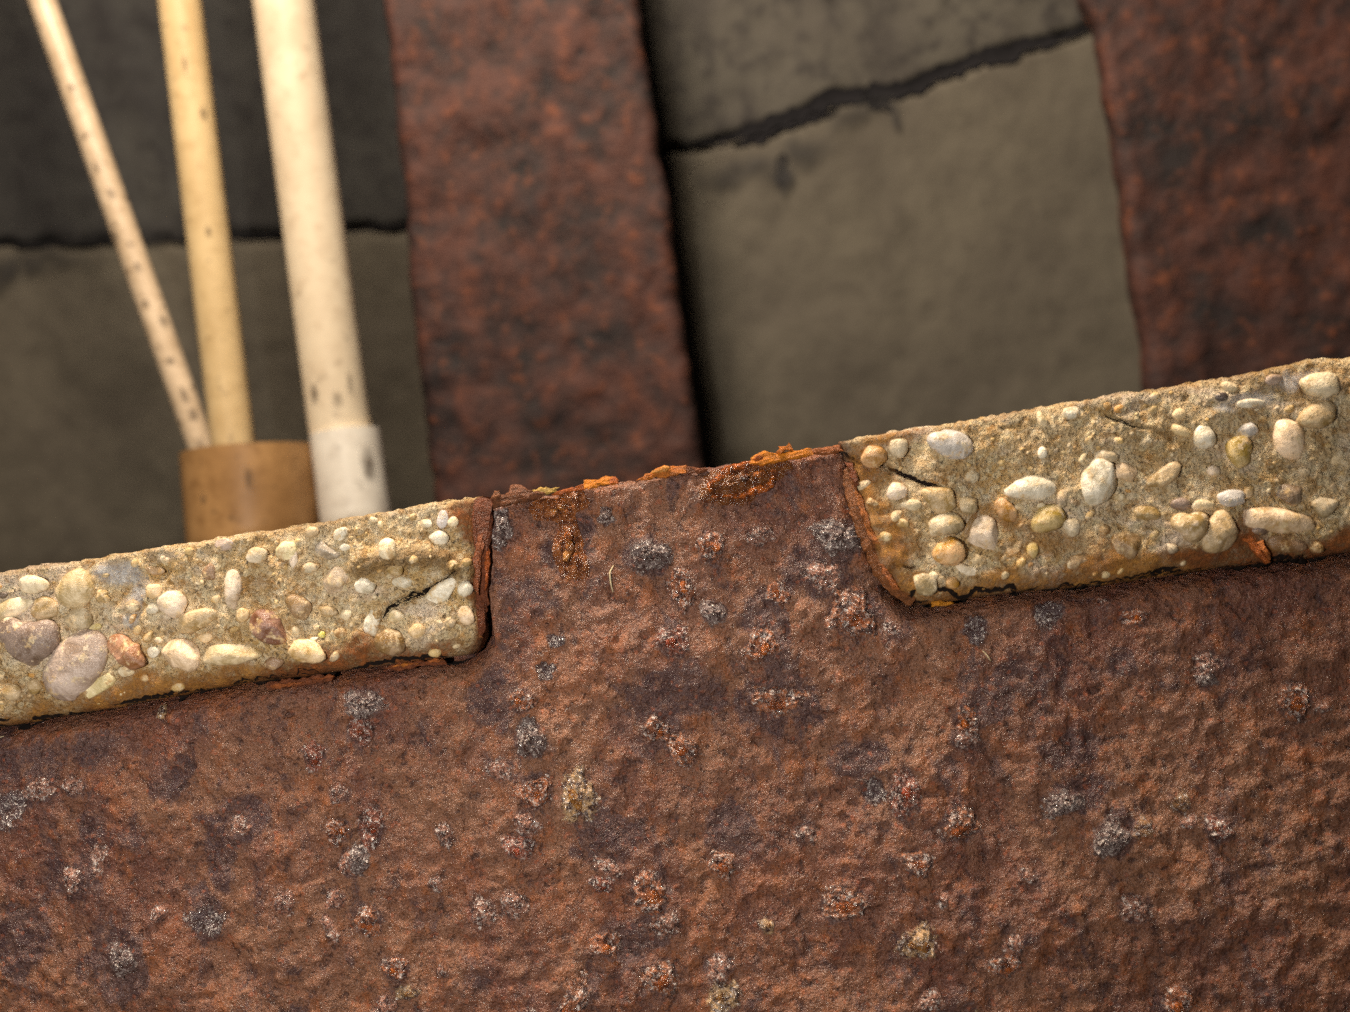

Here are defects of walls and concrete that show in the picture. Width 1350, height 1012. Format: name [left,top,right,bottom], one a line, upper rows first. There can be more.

crack [683,24,1090,185]
rust [699,461,794,506]
rust [766,431,1350,646]
rust [628,531,728,658]
rust [71,633,450,719]
rust [482,634,601,863]
rust [0,775,86,832]
rust [319,784,383,944]
rust [586,855,680,940]
rust [706,951,744,1012]
rust [820,883,871,923]
rust [894,920,938,961]